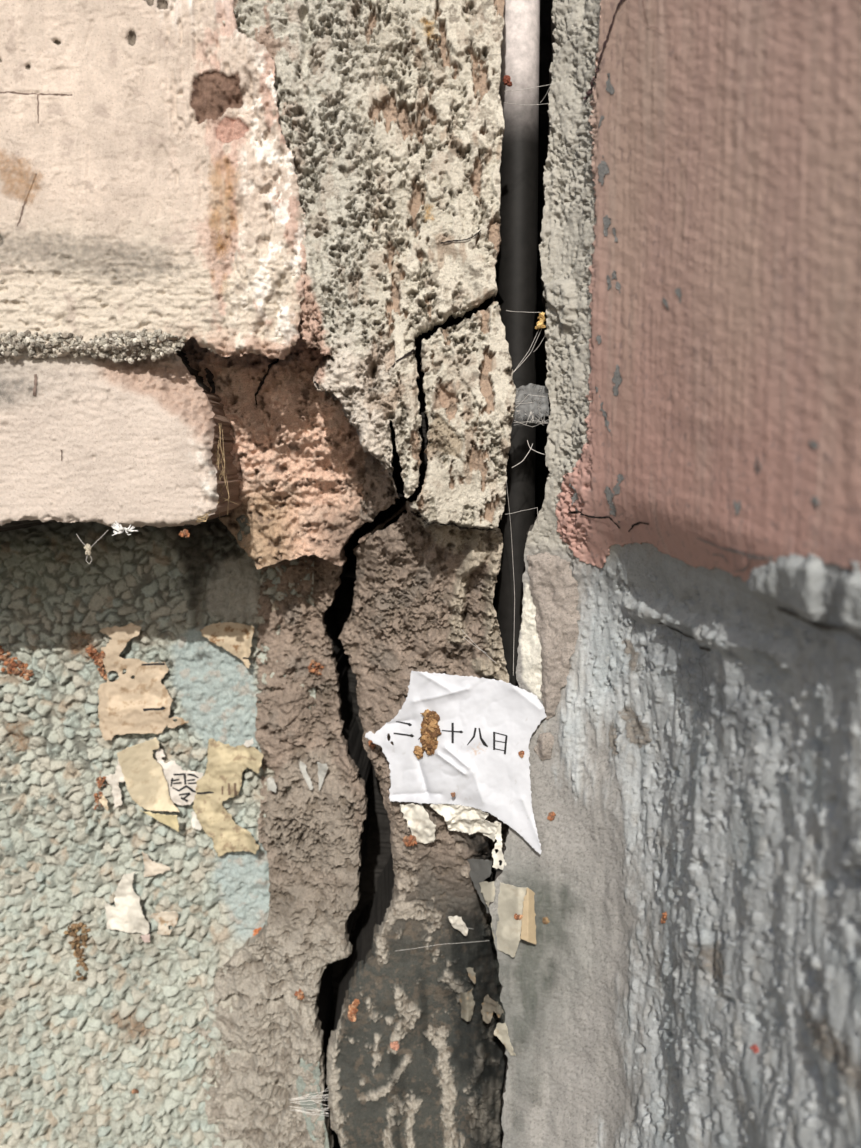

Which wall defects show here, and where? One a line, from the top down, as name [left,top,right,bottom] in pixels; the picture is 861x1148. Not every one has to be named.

crack [583,0,662,100]
crack [440,230,481,244]
peeling [604,474,624,523]
crack [316,291,504,1148]